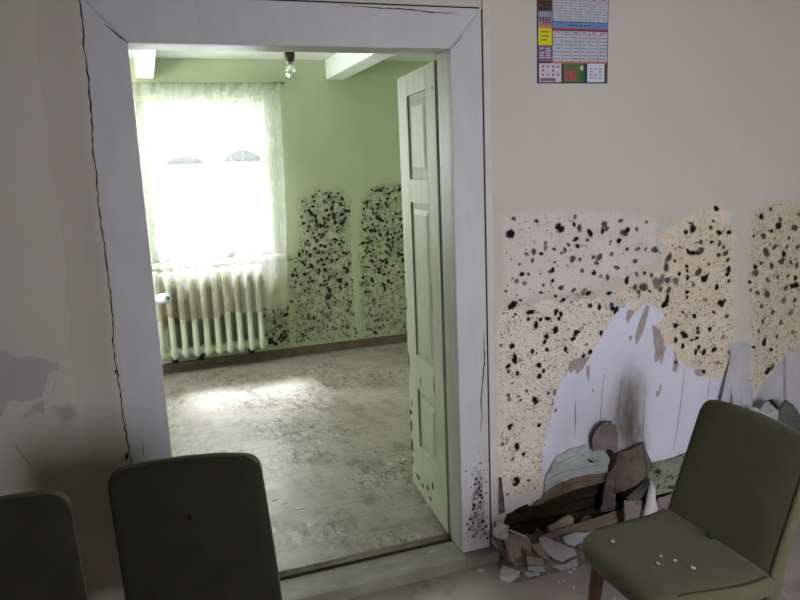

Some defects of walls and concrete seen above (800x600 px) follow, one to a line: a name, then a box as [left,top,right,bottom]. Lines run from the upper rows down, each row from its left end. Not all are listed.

crack [79,0,144,463]
damp [254,173,407,352]
crack [478,341,486,431]
spalling [530,444,616,506]
damp [465,192,800,543]